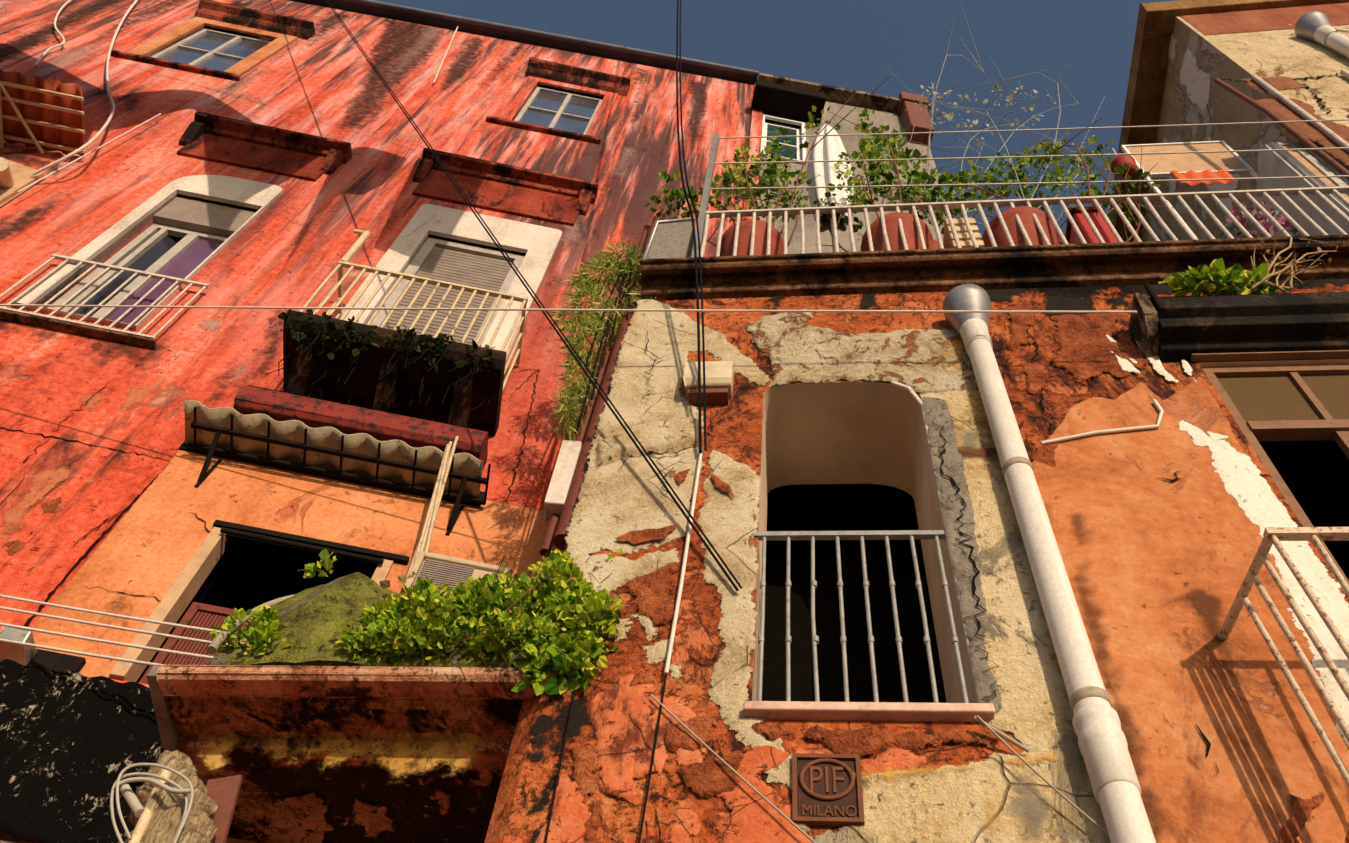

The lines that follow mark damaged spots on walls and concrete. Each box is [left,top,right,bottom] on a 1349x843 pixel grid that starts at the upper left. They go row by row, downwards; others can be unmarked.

damp [0,0,125,62]
damp [342,20,441,127]
damp [442,37,483,90]
damp [0,150,58,171]
damp [0,202,52,239]
flaking render [1007,303,1197,395]
crack [503,369,540,503]
crack [0,381,193,627]
flaking render [535,298,1111,843]
peeling [1179,420,1349,747]
damp [228,747,502,843]
flaking render [1278,792,1325,843]